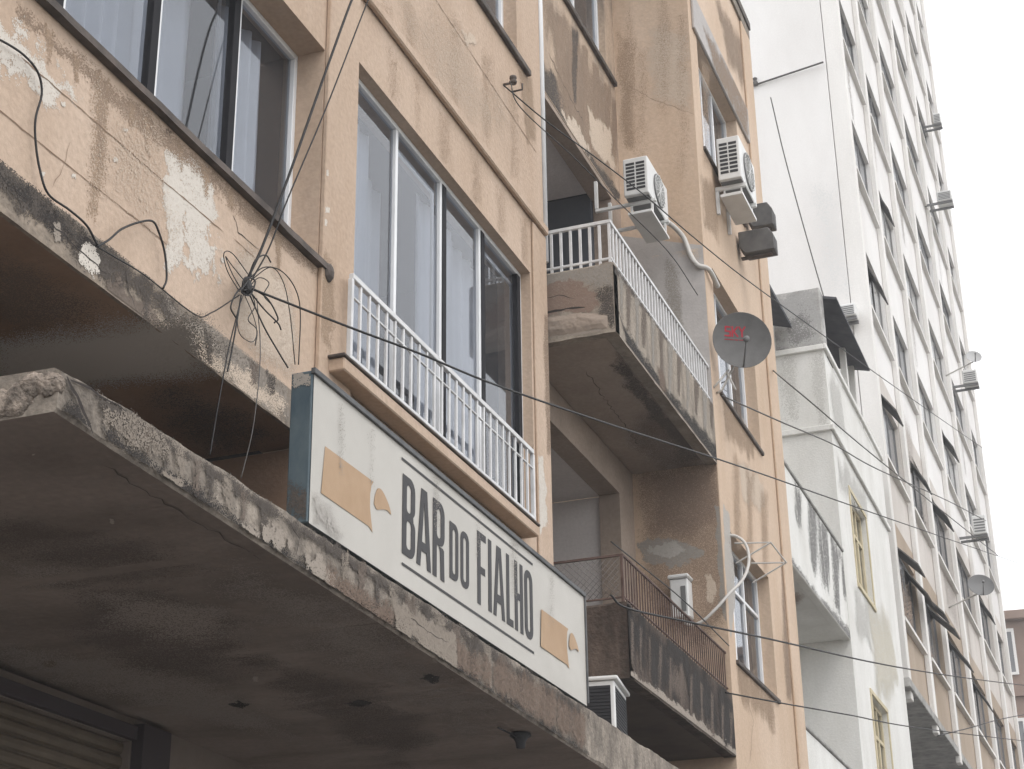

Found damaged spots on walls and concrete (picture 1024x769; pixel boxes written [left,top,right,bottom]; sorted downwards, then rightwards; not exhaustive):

damp [506,0,749,244]
damp [0,4,336,353]
peeling [161,149,225,286]
spalling [78,241,161,327]
spalling [0,372,66,418]
damp [249,359,277,396]
peeling [102,406,184,487]
damp [547,248,899,749]
spalling [241,521,337,586]
spalling [647,540,686,559]